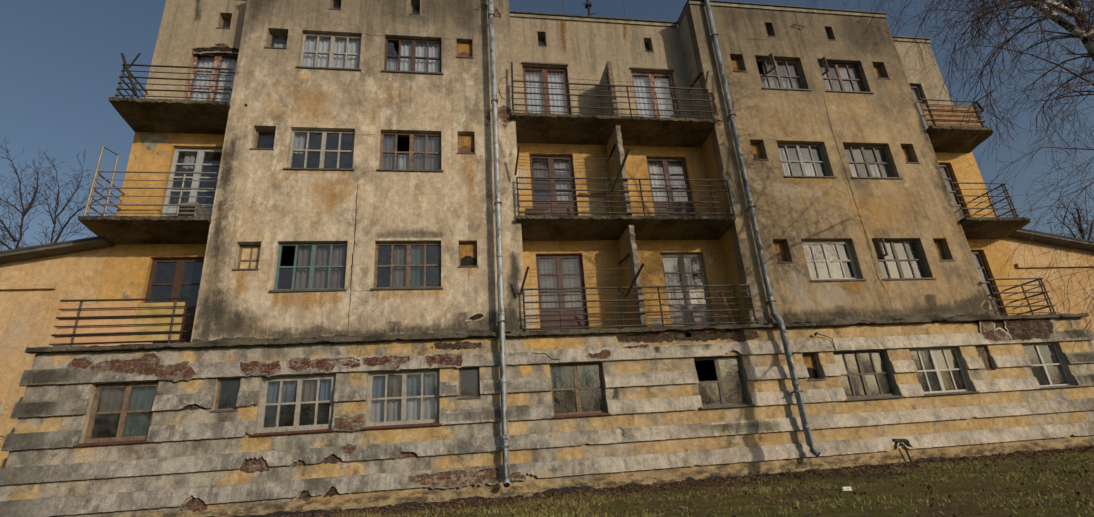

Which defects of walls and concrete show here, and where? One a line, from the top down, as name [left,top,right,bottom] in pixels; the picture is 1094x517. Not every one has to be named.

spalling [585,279,770,361]
spalling [957,281,1054,343]
spalling [68,351,198,382]
spalling [238,354,411,377]
spalling [424,341,482,369]
spalling [240,457,270,473]
spalling [397,452,418,460]
spalling [406,465,528,489]